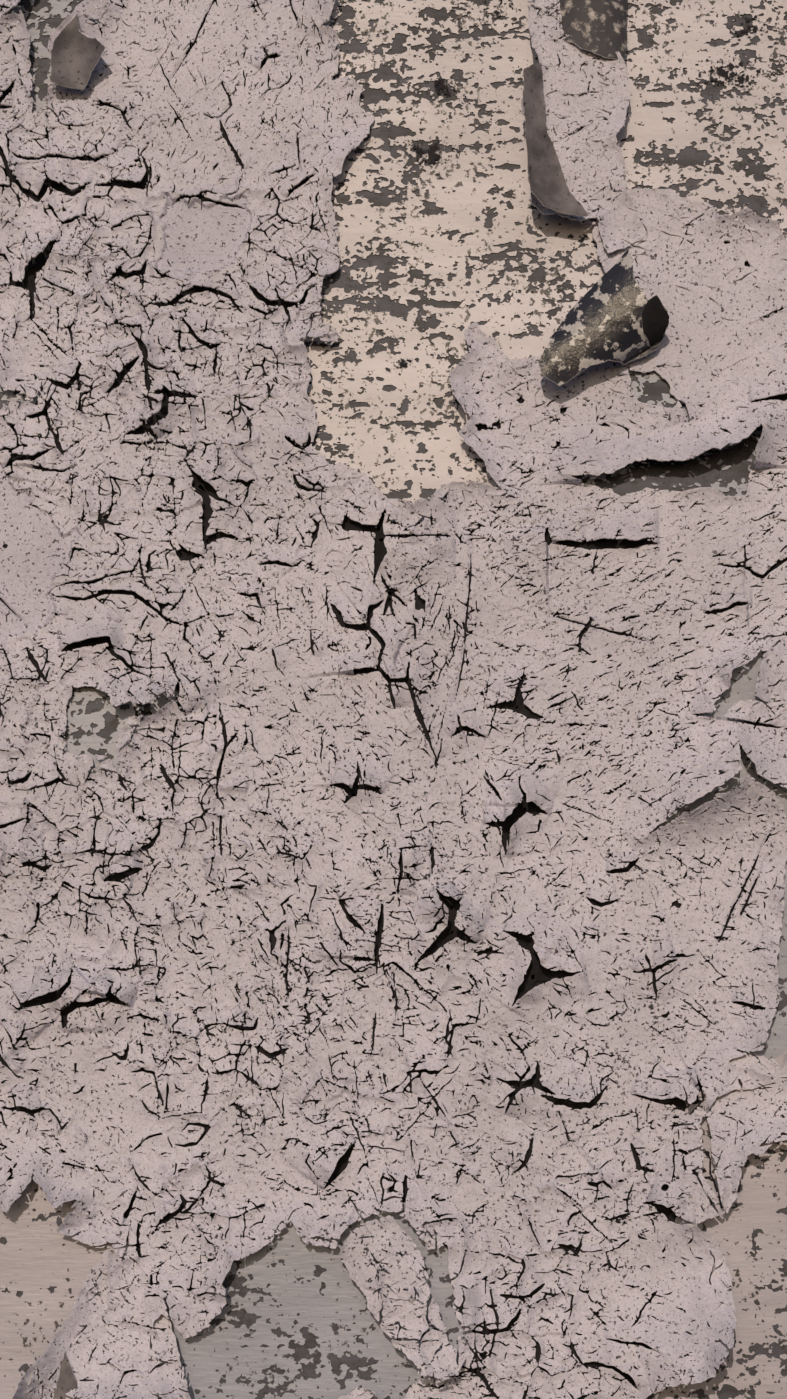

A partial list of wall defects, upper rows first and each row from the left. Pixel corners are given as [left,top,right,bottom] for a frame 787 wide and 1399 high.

peeling [0,0,116,134]
crack [0,79,245,209]
peeling [0,345,44,432]
crack [3,260,317,472]
peeling [281,0,787,527]
crack [182,434,550,760]
crack [0,552,238,856]
peeling [45,670,193,785]
crack [0,972,211,1147]
crack [284,845,585,1055]
peeling [618,627,787,1399]
peeling [0,1151,491,1399]